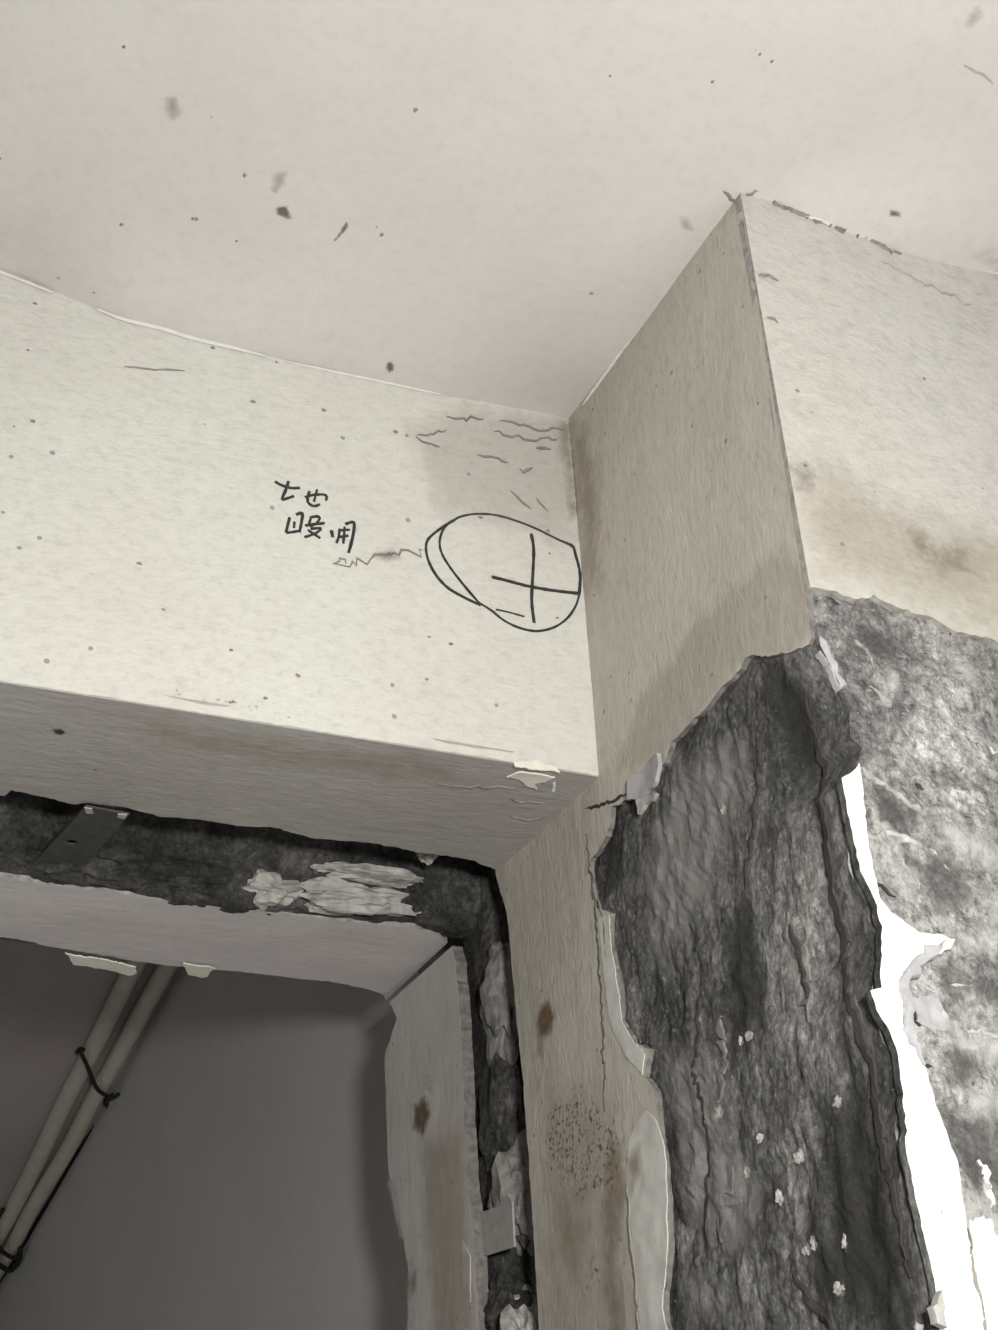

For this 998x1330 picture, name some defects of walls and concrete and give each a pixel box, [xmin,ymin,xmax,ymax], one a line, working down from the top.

crack [333,549,422,568]
peeling [507,760,560,792]
peeling [65,952,137,976]
spalling [595,593,998,1330]